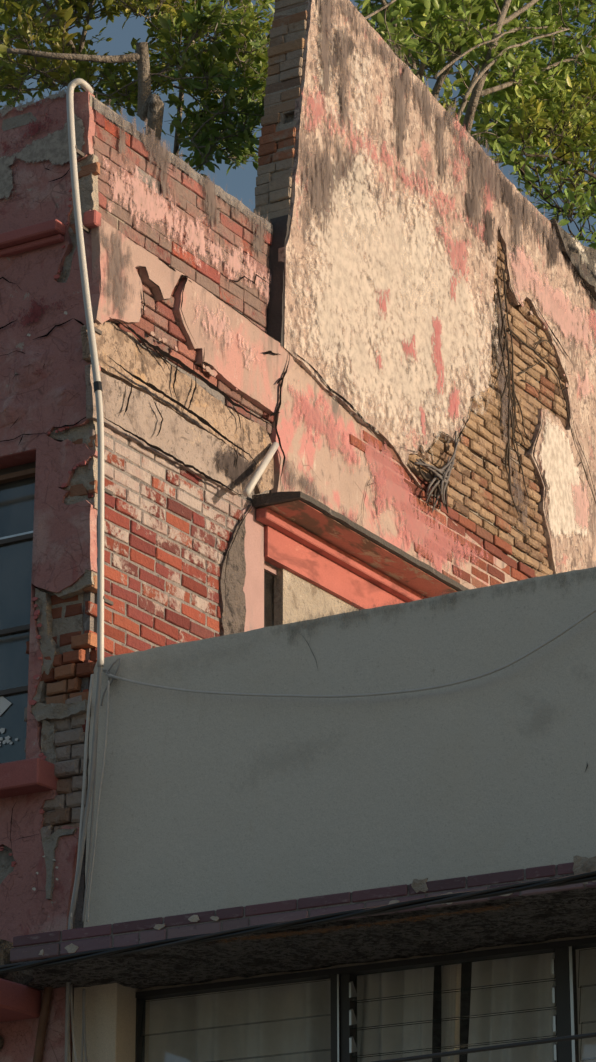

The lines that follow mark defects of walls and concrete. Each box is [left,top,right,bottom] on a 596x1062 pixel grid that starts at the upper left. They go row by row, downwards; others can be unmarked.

spalling [47,420,98,511]
peeling [0,113,271,303]
spalling [116,268,274,435]
crack [0,239,487,607]
peeling [292,25,596,588]
leakage [302,0,596,311]
spalling [24,569,97,900]
spalling [573,855,596,885]